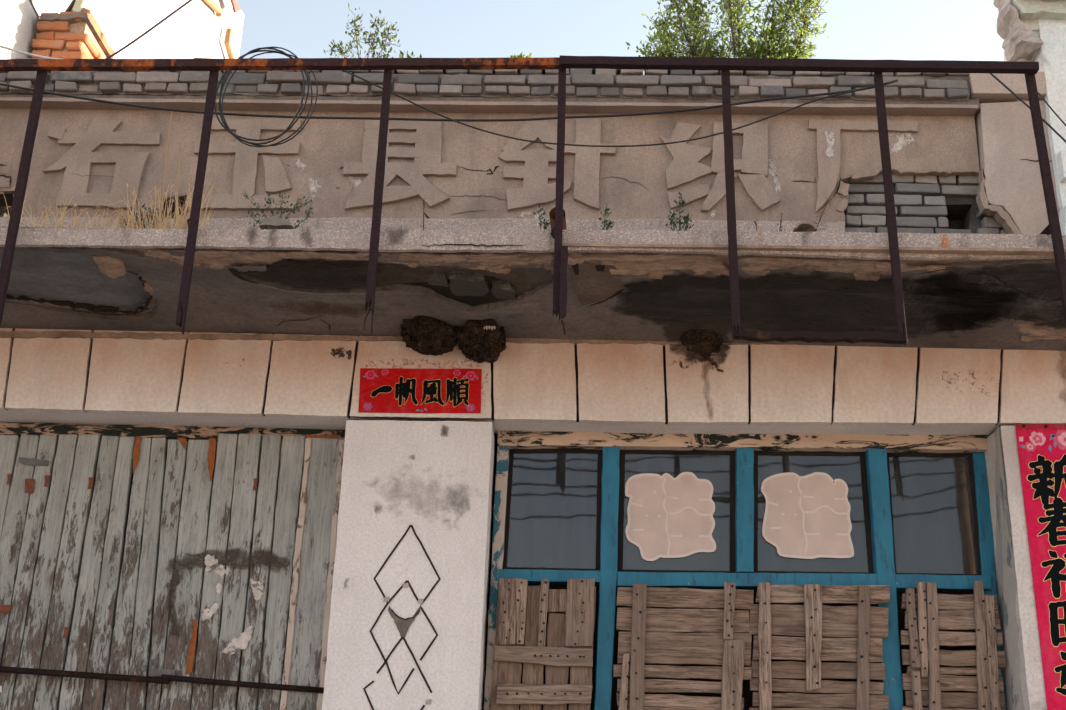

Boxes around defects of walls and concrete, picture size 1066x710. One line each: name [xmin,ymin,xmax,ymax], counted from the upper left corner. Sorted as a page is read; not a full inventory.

spalling [836,166,1022,234]
spalling [0,251,158,322]
spalling [146,249,554,320]
damp [613,263,1066,338]